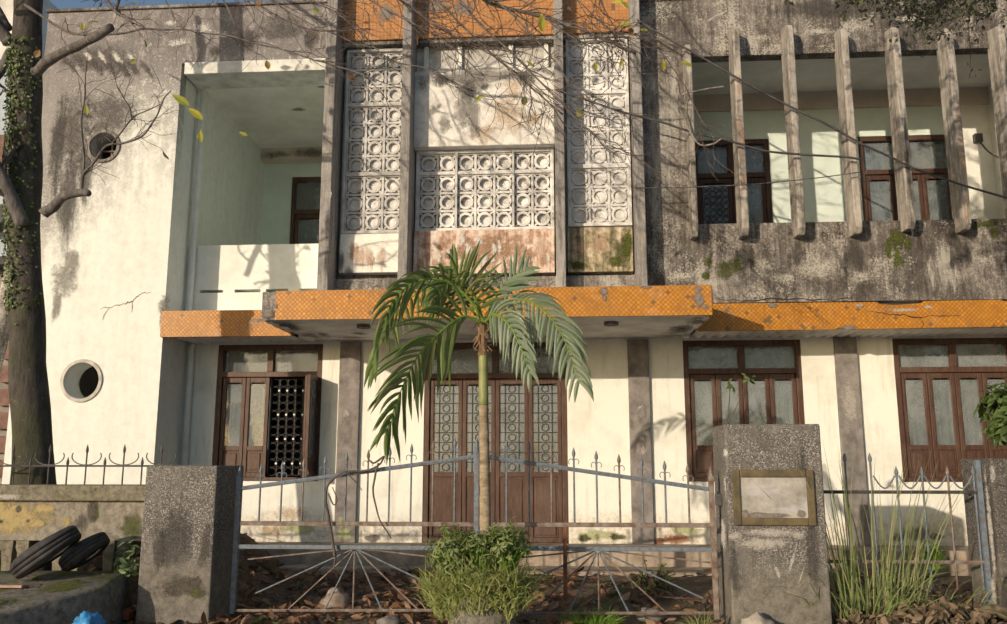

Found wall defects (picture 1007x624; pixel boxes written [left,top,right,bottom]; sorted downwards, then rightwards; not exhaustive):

water stain [240,18,318,52]
water stain [61,49,153,79]
water stain [420,70,534,133]
water stain [48,97,135,235]
water stain [52,253,78,318]
crack [101,292,151,318]
peeling [659,286,708,337]